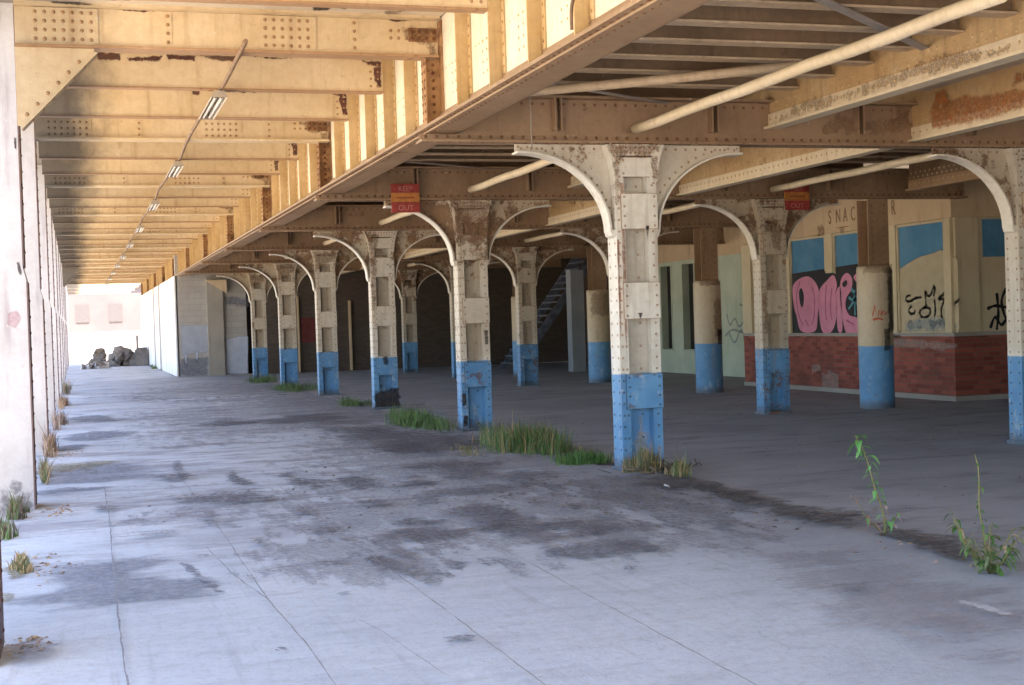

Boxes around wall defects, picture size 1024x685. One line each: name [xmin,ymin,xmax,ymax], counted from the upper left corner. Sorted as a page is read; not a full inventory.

corrosion [362,60,381,87]
corrosion [931,73,1024,127]
corrosion [608,144,659,205]
corrosion [451,200,491,247]
corrosion [617,232,627,341]
water stain [529,497,663,555]